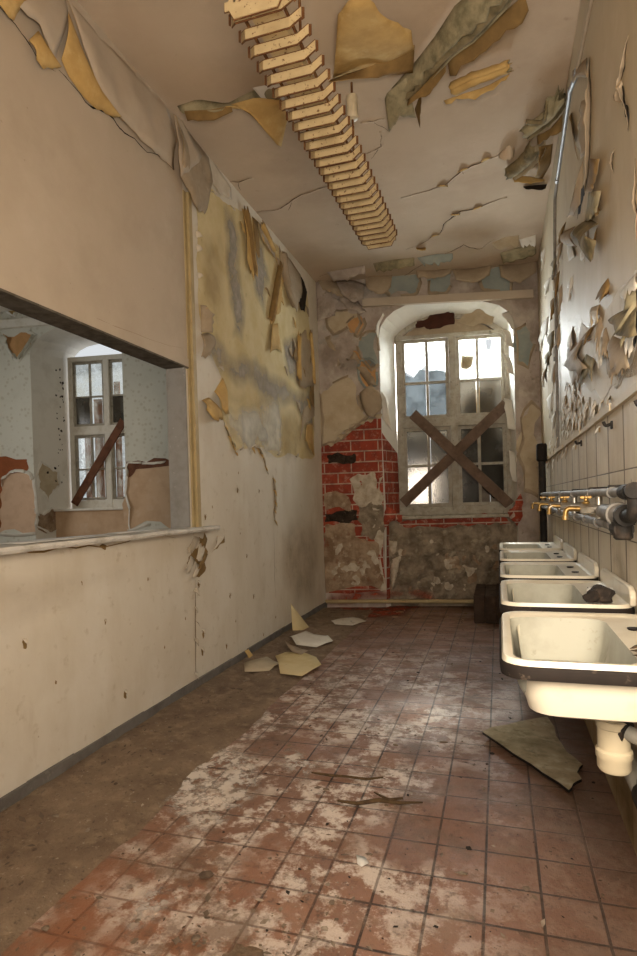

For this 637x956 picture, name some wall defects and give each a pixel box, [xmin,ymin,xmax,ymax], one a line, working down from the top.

crack [401,147,514,198]
crack [404,197,507,276]
peeling [0,0,637,606]